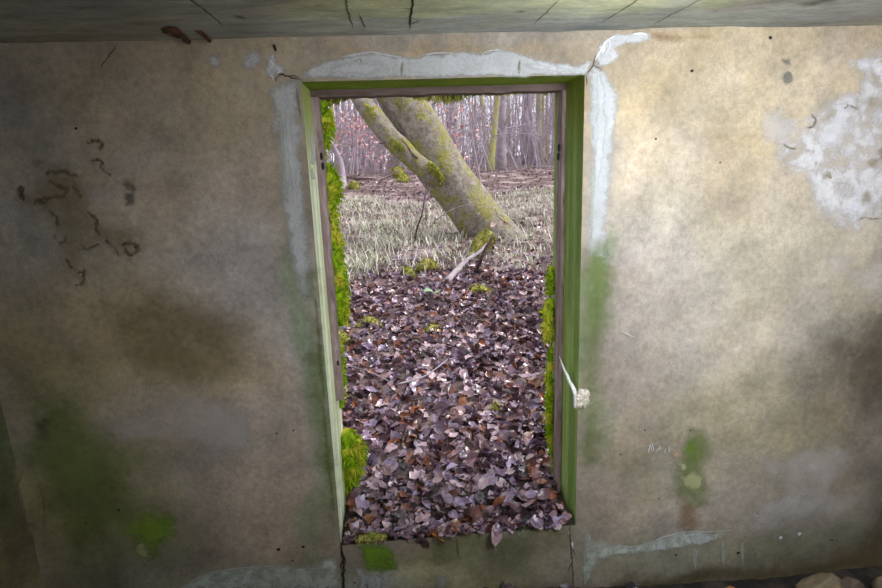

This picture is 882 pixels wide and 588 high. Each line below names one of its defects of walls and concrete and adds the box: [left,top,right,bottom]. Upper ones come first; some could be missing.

corrosion [162,26,211,44]
crack [345,0,365,28]
crack [406,0,420,29]
crack [586,0,637,86]
leakage [767,58,882,227]
leakage [672,440,702,489]
crack [339,543,347,588]